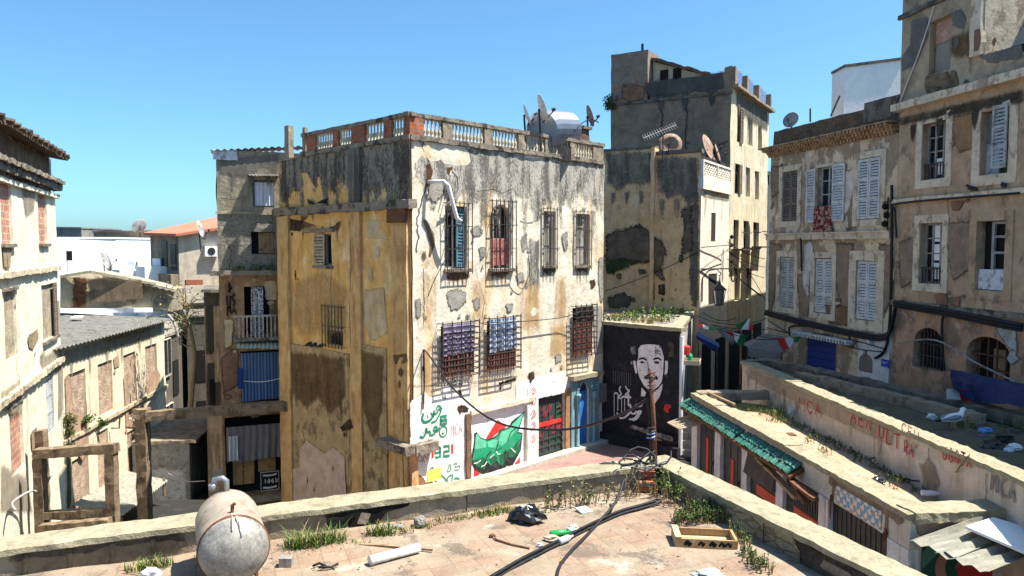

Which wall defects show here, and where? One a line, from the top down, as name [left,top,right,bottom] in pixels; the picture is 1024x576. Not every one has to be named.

leakage [219,150,348,235]
leakage [361,140,728,307]
peeling [446,289,486,319]
peeling [503,272,529,317]
peeling [590,205,694,357]
leakage [291,353,345,420]
leakage [362,352,383,438]
peeling [293,440,346,501]